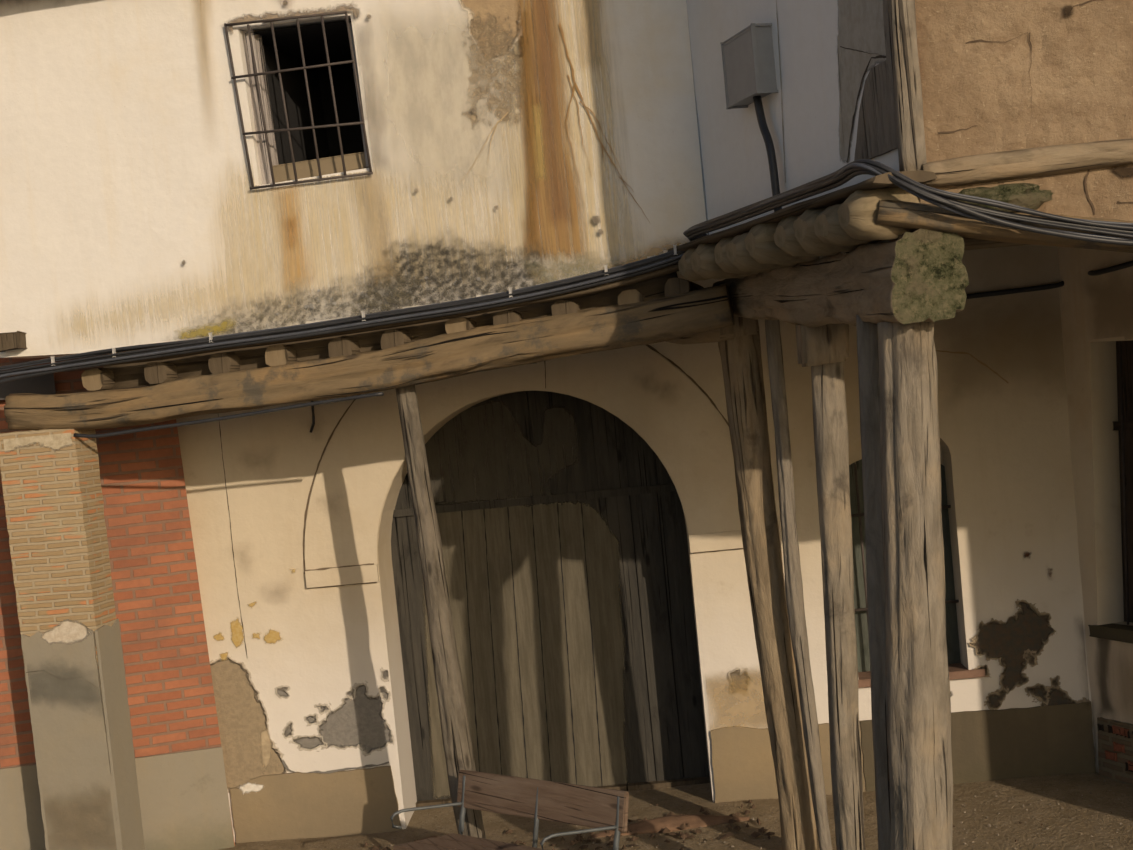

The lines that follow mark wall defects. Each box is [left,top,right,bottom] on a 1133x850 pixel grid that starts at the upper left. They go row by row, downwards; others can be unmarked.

leakage [74,0,634,337]
spalling [458,0,524,125]
crack [559,23,650,223]
spalling [42,620,89,644]
spalling [210,619,394,794]
peeling [969,599,1090,710]